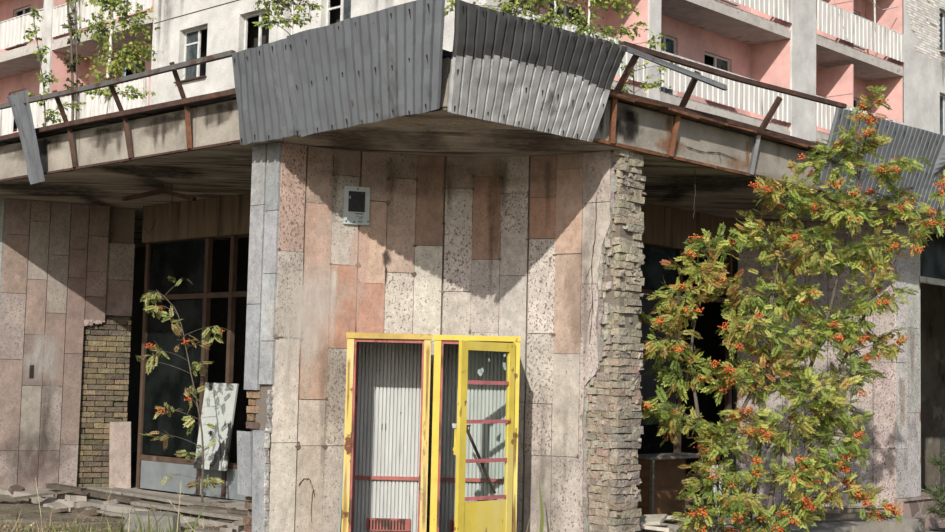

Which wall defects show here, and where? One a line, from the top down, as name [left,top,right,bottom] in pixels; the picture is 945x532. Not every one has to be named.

leakage [616,109,639,139]
leakage [38,139,58,154]
leakage [107,166,194,189]
spalling [76,319,132,487]